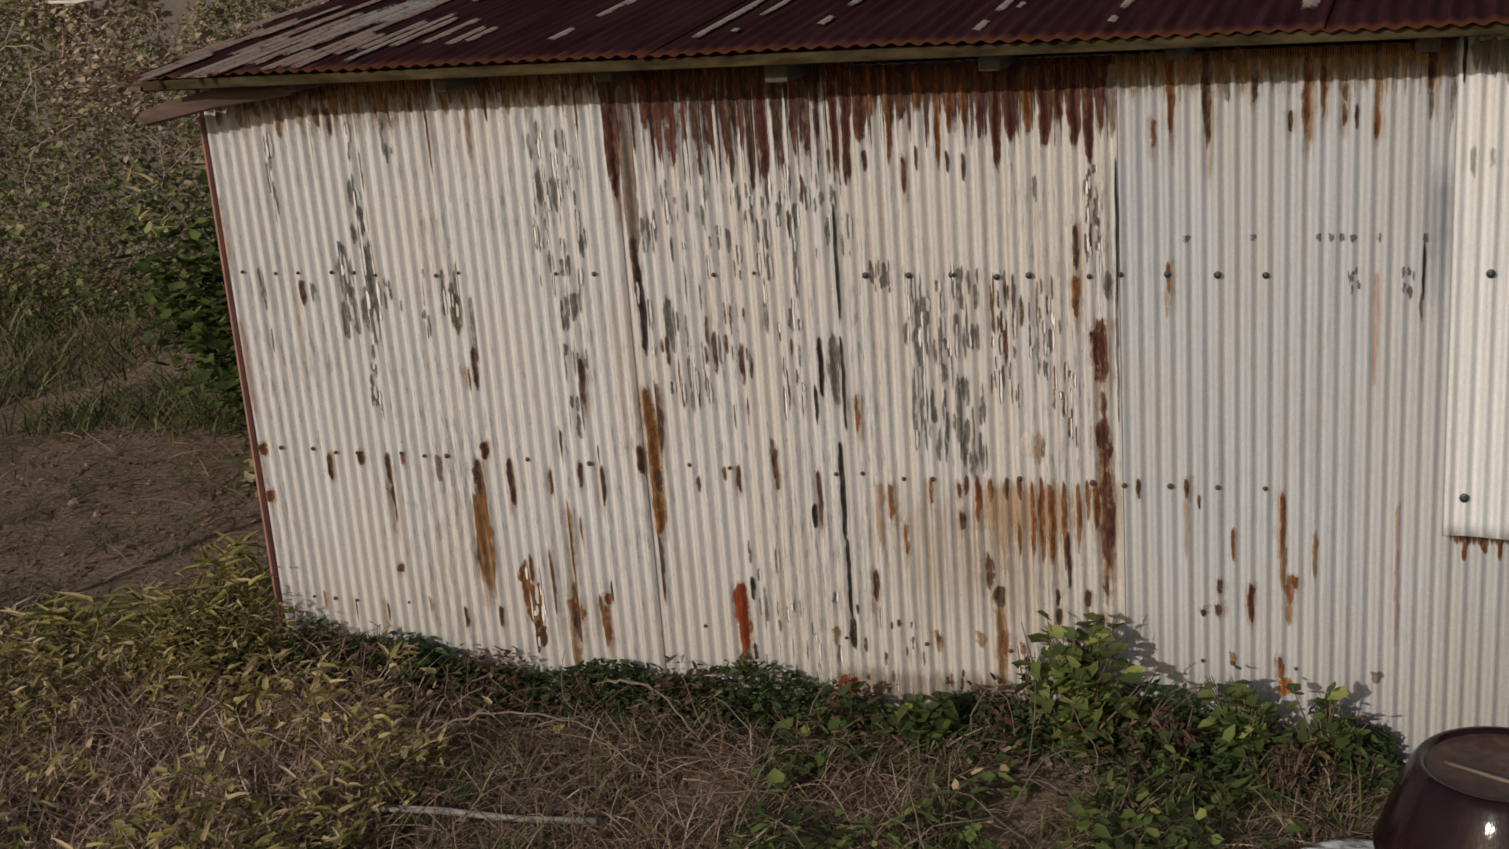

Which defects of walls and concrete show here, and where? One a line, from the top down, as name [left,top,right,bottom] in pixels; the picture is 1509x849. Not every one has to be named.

peeling [526,119,588,439]
peeling [636,163,852,427]
corrosion [208,37,1457,356]
peeling [869,260,1077,482]
peeling [1083,164,1112,300]
corrosion [471,442,504,627]
corrosion [517,469,613,665]
corrosion [635,386,667,602]
corrosion [733,582,753,683]
corrosion [957,318,1116,696]
corrosion [1280,493,1319,625]
corrosion [1450,536,1509,561]